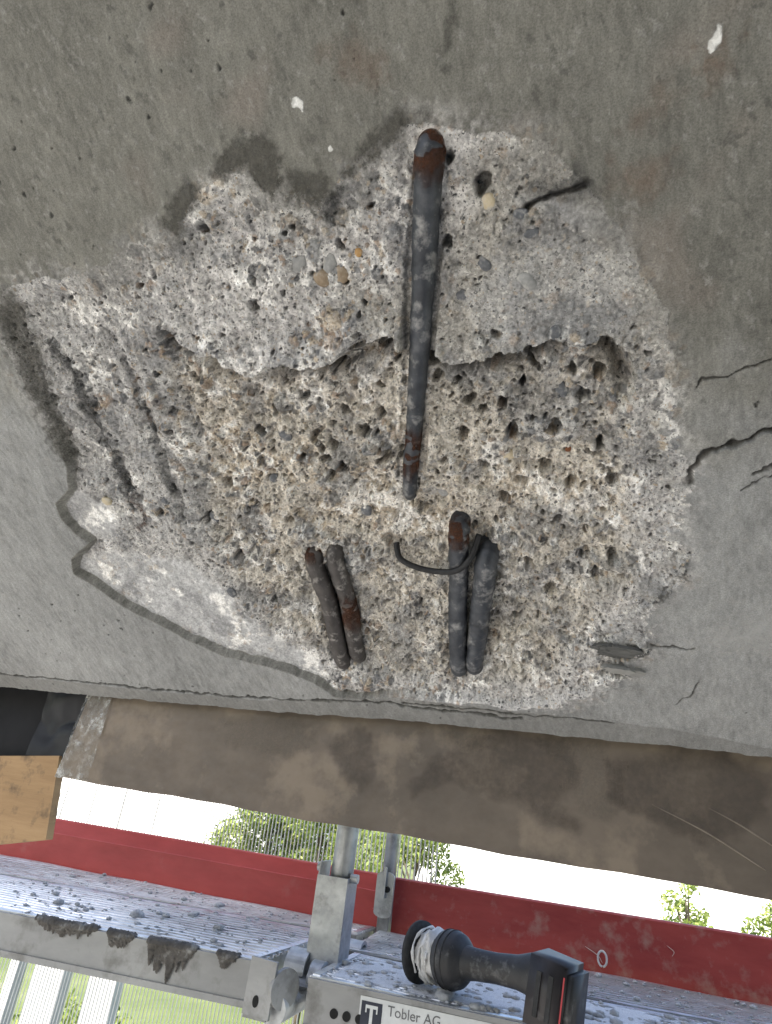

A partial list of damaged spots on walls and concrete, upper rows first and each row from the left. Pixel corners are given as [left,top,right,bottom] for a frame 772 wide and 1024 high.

water stain [162,184,199,236]
water stain [212,129,334,214]
water stain [341,107,410,178]
corrosion [412,128,446,177]
crack [521,175,594,213]
crack [697,358,772,387]
spalling [0,121,696,711]
corrosion [403,432,423,475]
crack [681,426,772,490]
corrosion [448,519,471,550]
corrosion [337,591,361,630]